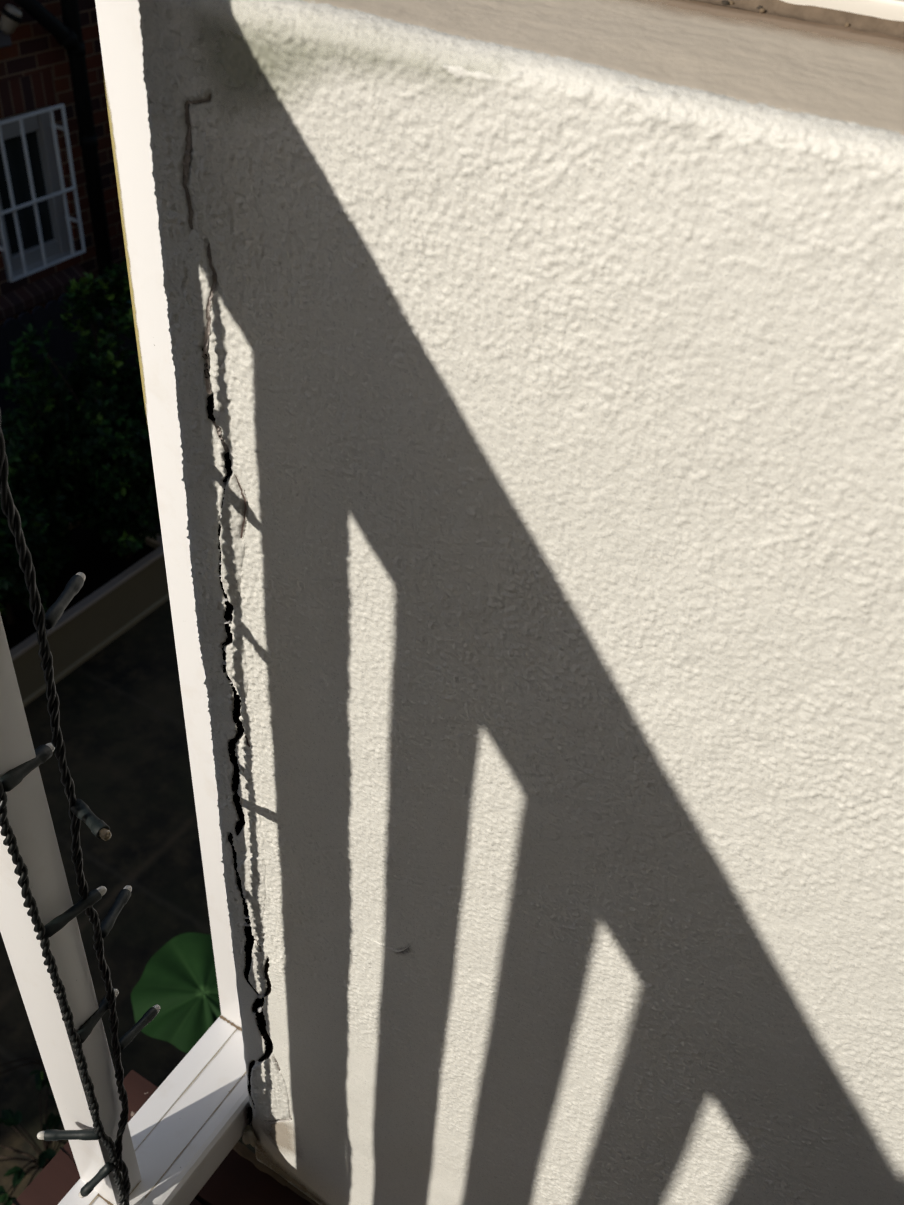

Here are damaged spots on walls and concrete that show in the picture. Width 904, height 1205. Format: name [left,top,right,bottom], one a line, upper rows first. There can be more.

crack [182,93,280,1124]